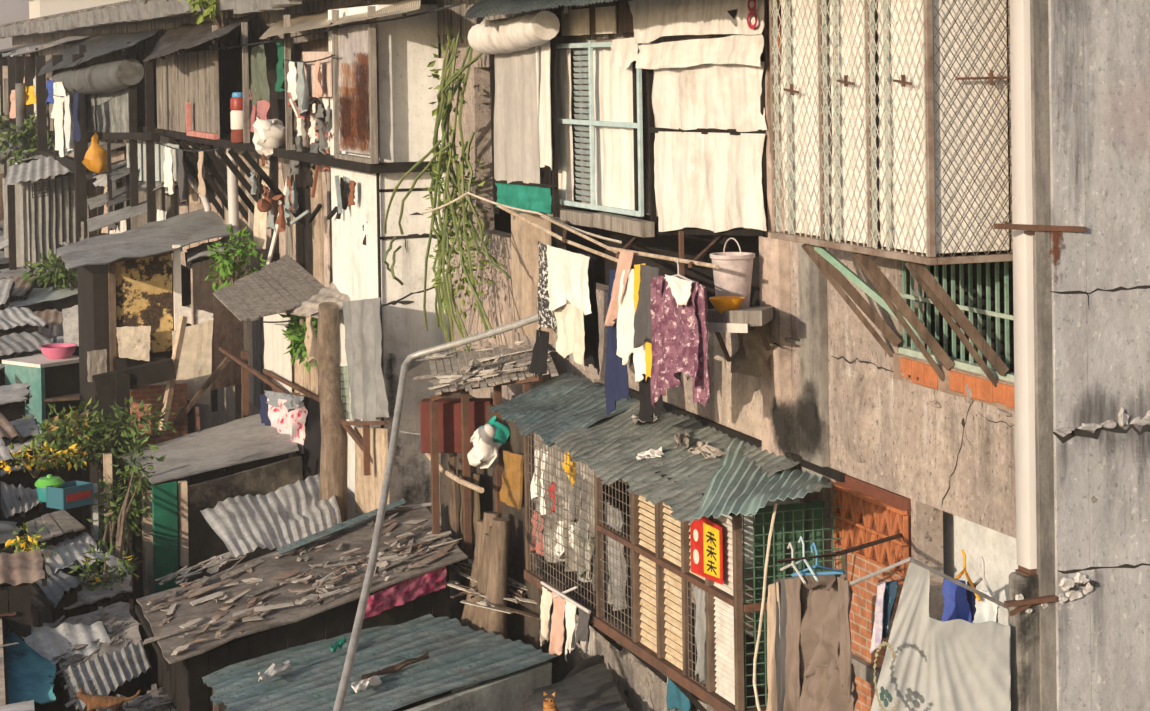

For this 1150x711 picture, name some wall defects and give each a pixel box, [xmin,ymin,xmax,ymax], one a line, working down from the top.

rust [338,24,370,155]
rust [1050,231,1063,266]
crack [1049,285,1150,310]
crack [832,356,893,372]
water stain [771,382,820,459]
crack [941,404,1013,508]
spalling [1058,572,1097,603]